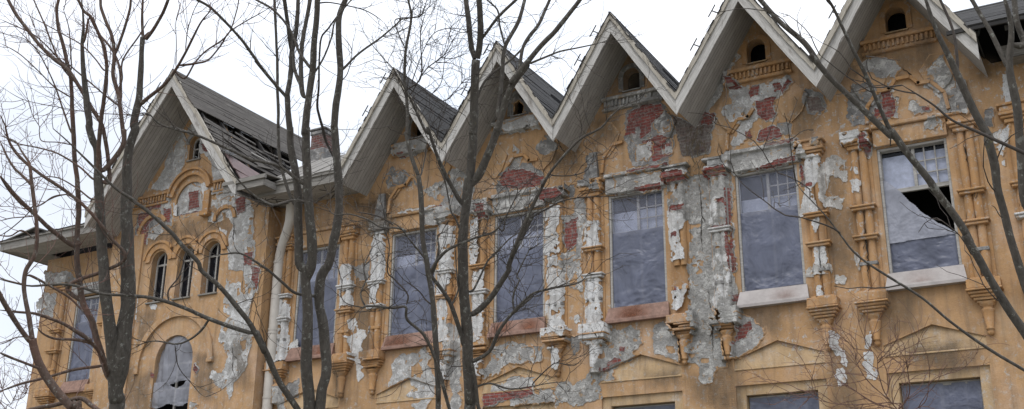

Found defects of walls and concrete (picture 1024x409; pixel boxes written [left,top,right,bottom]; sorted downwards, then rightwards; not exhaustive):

spalling [134,124,261,399]
peeling [343,318,370,382]
spalling [383,53,970,409]
crack [698,184,706,252]